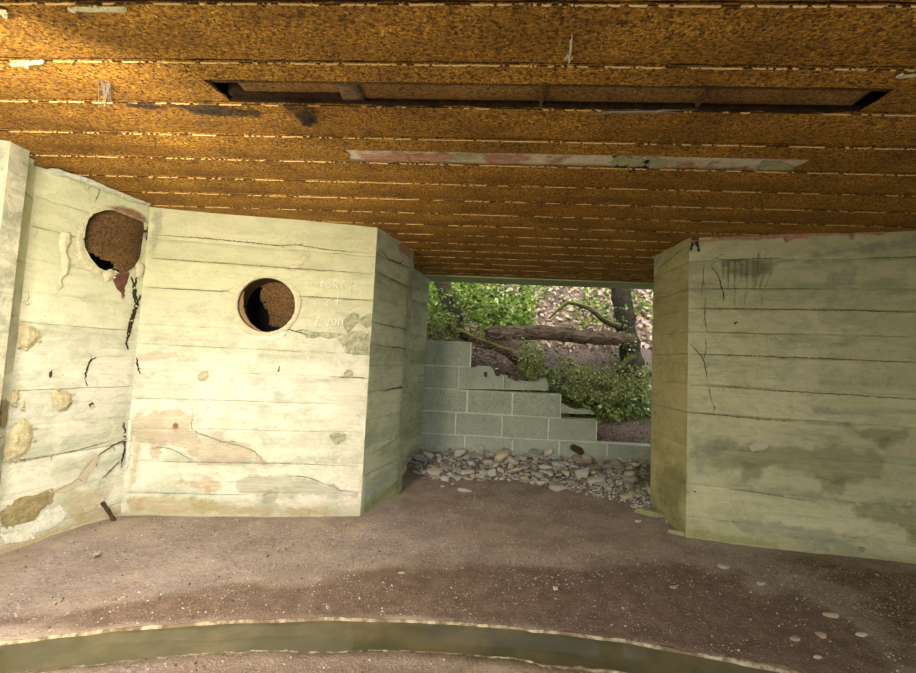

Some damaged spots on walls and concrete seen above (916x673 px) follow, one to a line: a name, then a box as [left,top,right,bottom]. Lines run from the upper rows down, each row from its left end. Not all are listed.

crack [563,37,573,64]
rust [113,272,129,298]
crack [149,234,414,287]
crack [125,277,226,373]
crack [690,254,916,422]
crack [4,423,127,491]
peeling [123,420,132,470]
crack [156,415,353,492]
spalling [0,453,99,544]
crack [165,490,248,498]